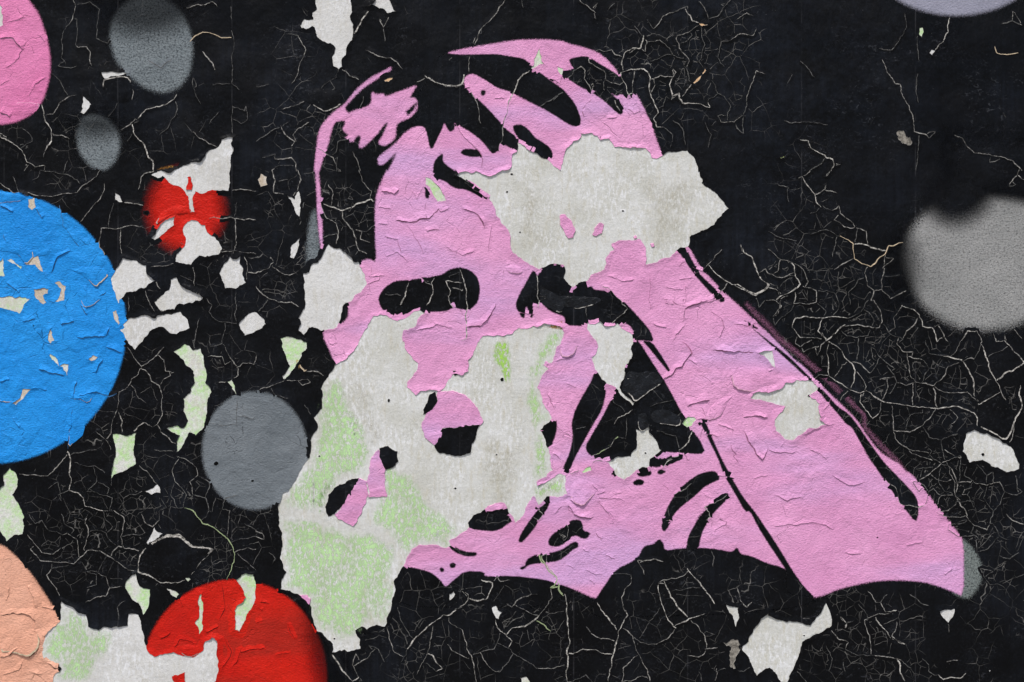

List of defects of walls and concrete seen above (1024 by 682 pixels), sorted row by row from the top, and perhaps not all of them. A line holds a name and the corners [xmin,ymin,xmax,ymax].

peeling [297,0,402,79]
crack [878,8,1024,188]
peeling [0,125,734,682]
crack [0,0,816,676]
crack [330,118,1024,682]
peeling [732,346,836,446]
peeling [958,394,1024,476]
peeling [719,597,837,682]